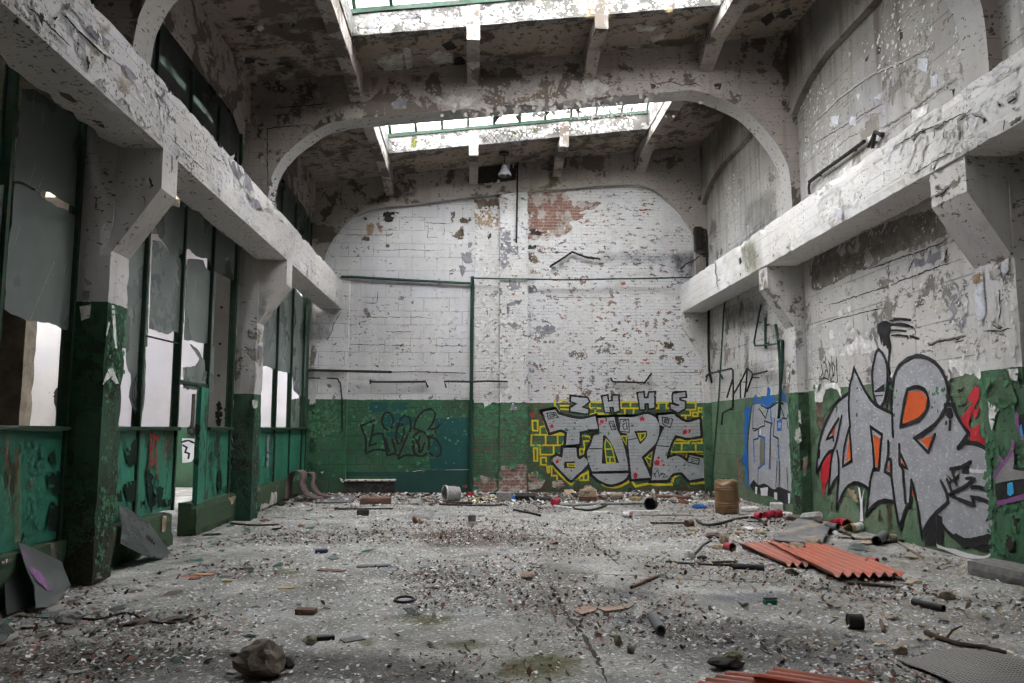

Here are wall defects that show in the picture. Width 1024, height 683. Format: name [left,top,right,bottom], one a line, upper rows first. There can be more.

peeling [11,0,342,305]
peeling [426,41,465,65]
peeling [377,48,703,151]
peeling [664,0,1022,363]
peeling [0,191,1024,683]